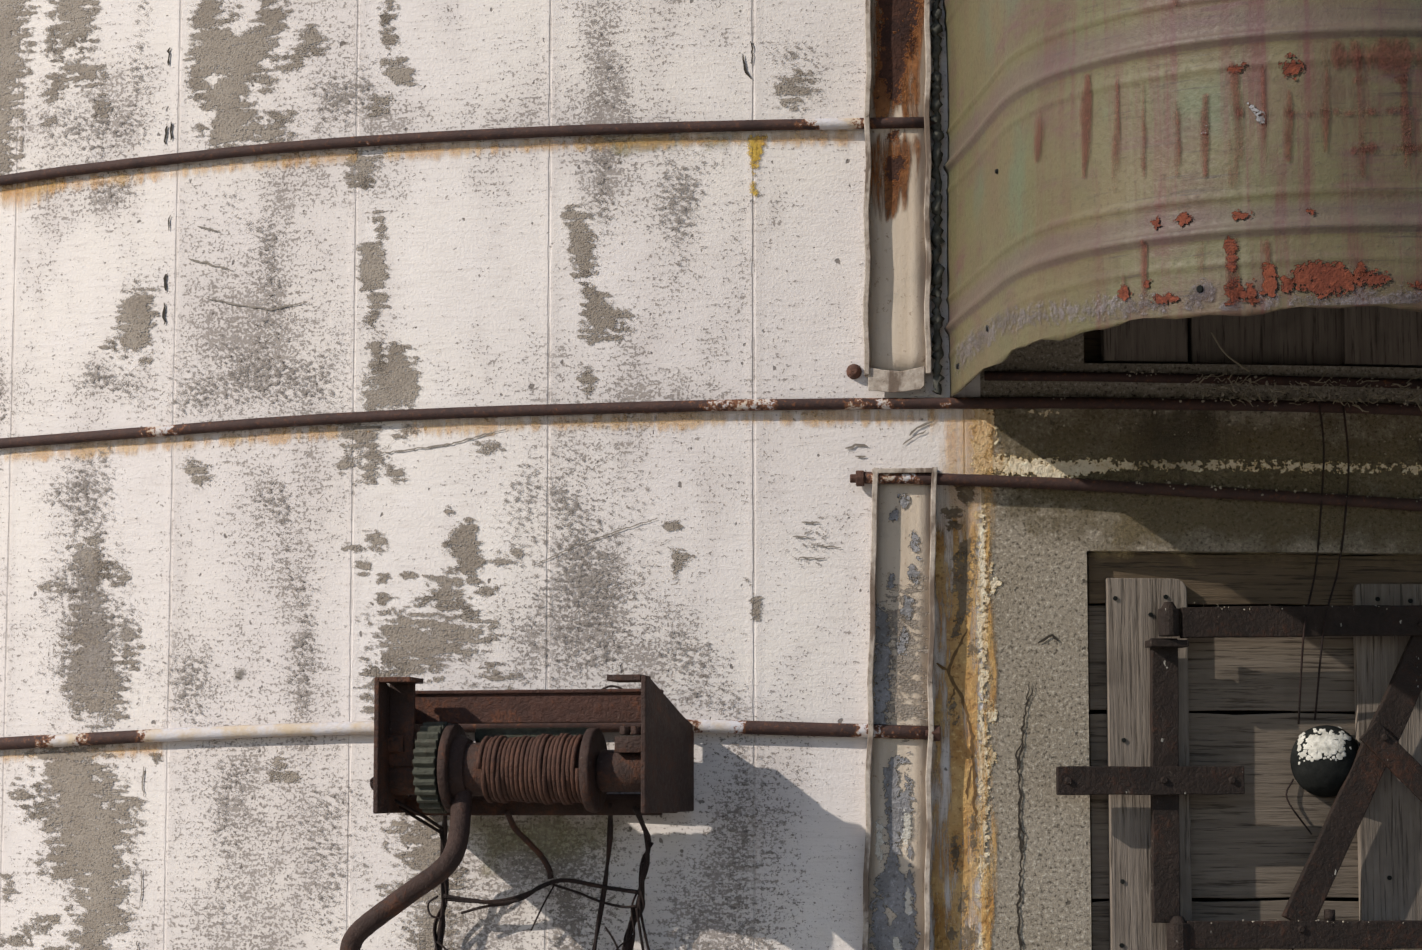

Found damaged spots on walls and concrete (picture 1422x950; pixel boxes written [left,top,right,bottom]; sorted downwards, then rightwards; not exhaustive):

peeling [0,0,160,219]
peeling [68,176,423,489]
peeling [183,0,418,152]
peeling [560,121,738,345]
corrosion [870,0,924,221]
corrosion [1082,74,1090,173]
peeling [0,445,222,950]
peeling [341,421,831,950]
crack [936,628,978,831]
corrosion [930,518,997,950]
crack [1015,682,1034,950]
peeling [941,409,1422,950]